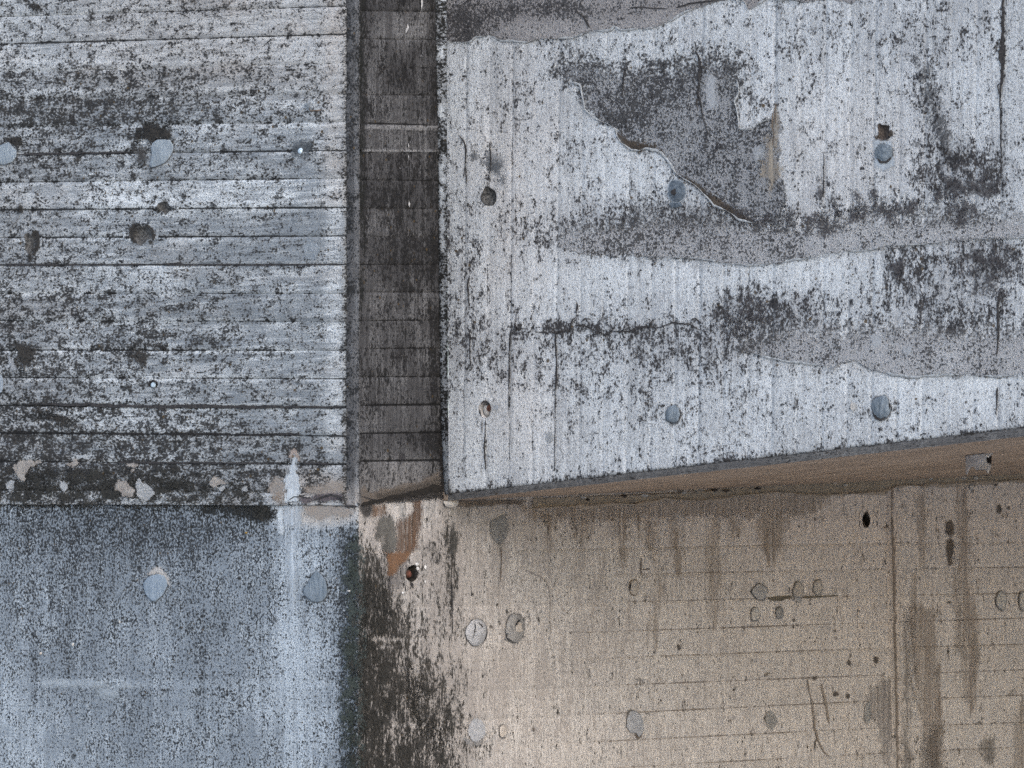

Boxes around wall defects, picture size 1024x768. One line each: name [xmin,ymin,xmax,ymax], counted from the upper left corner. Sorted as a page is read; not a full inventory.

spalling [446,0,1024,266]
spalling [722,311,1024,380]
peeling [6,460,41,492]
peeling [115,463,155,502]
peeling [209,477,228,491]
corrosion [386,500,424,590]
water stain [447,525,457,558]
water stain [946,487,967,571]
water stain [347,580,466,768]
water stain [902,598,943,768]
water stain [979,739,995,763]